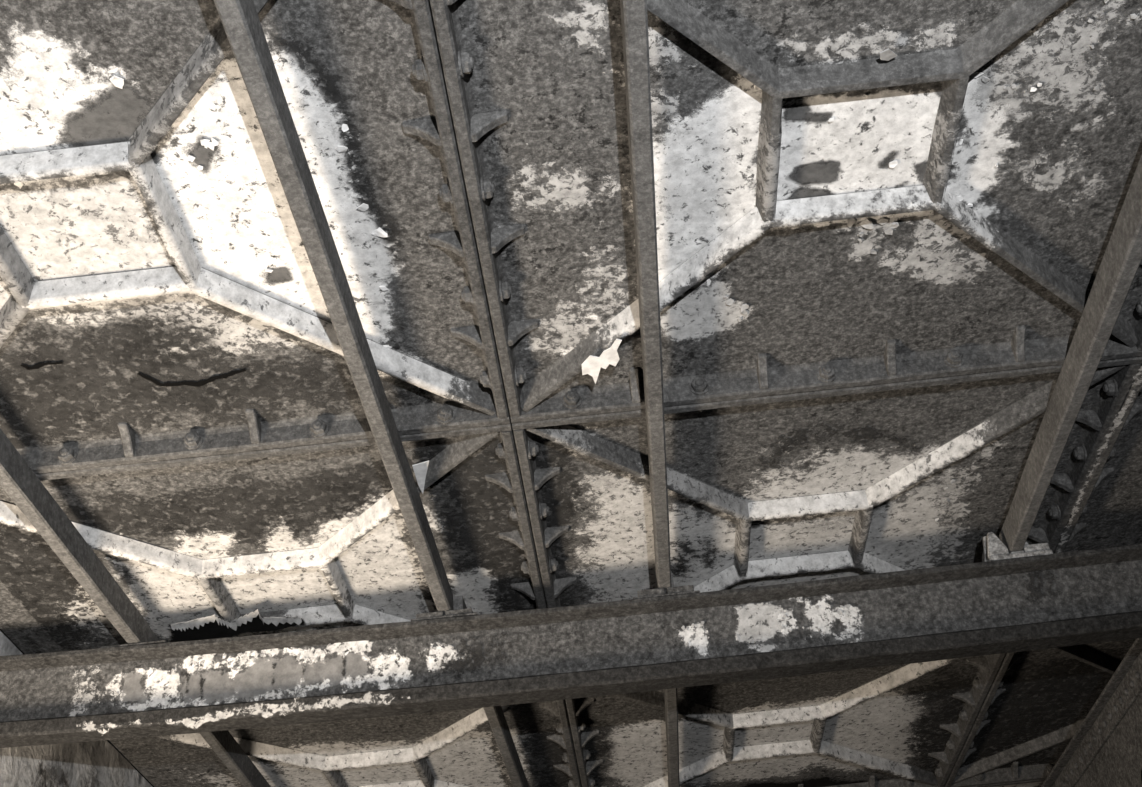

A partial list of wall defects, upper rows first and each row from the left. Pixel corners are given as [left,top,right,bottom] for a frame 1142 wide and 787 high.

spalling [548,0,615,62]
spalling [65,85,151,147]
spalling [190,135,221,171]
spalling [267,267,293,285]
peeling [660,281,758,344]
peeling [581,338,622,384]
peeling [169,609,306,642]
peeling [69,640,413,717]
peeling [424,642,466,671]
peeling [678,621,709,657]
peeling [733,595,864,652]